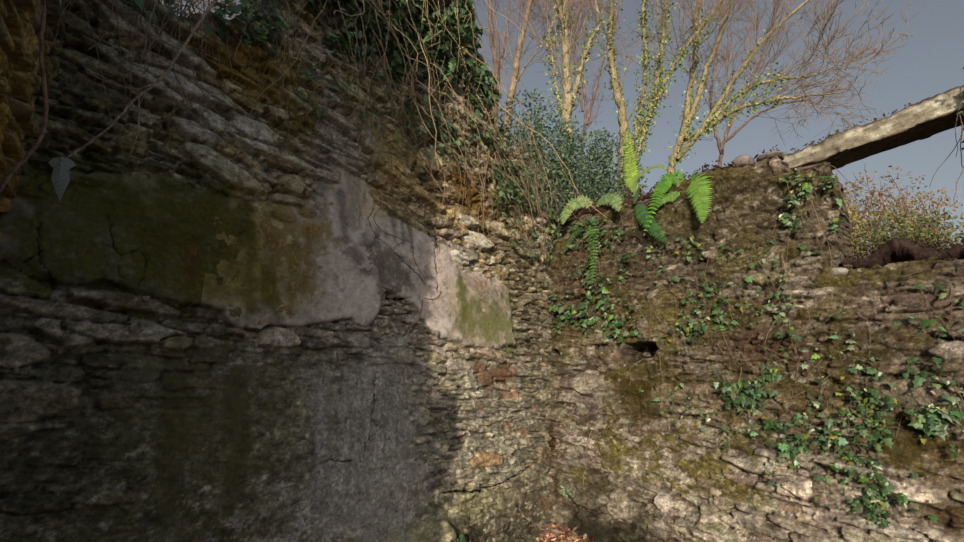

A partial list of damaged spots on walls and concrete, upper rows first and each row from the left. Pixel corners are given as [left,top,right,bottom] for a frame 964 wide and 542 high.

flaking render [108,290,440,369]
damp [258,340,428,542]
flaking render [406,368,547,524]